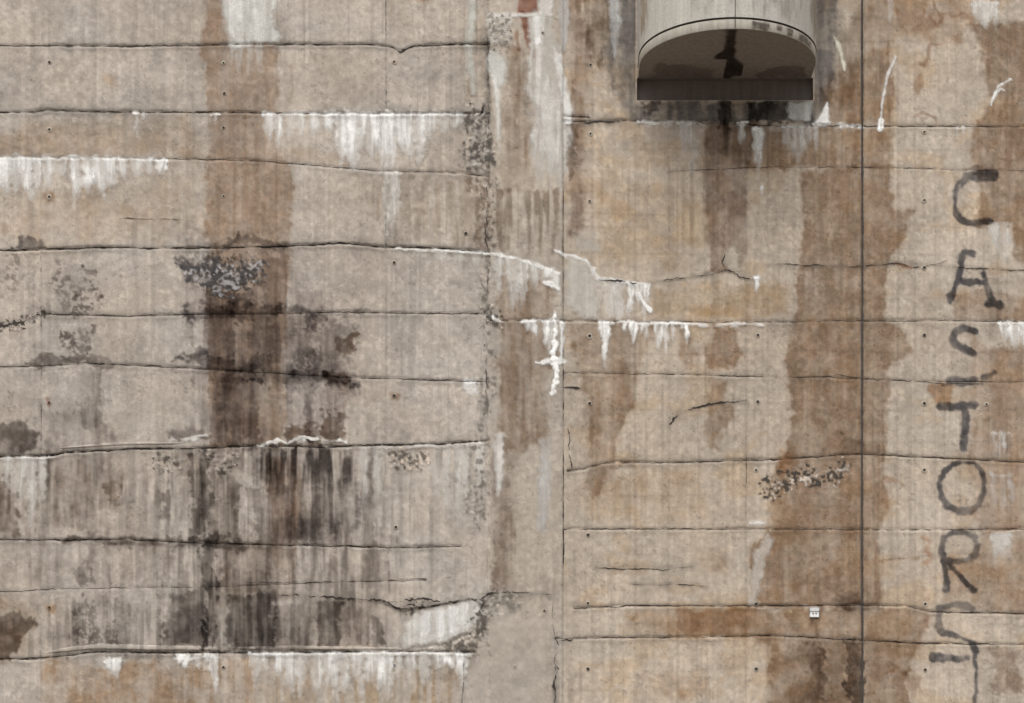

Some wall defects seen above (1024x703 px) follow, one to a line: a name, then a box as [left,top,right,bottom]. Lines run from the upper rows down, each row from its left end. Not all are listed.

water stain [262,111,282,135]
water stain [298,110,437,156]
water stain [0,157,52,190]
water stain [65,155,168,187]
spalling [175,253,269,298]
crack [661,255,1013,281]
water stain [396,247,707,358]
water stain [521,313,566,396]
crack [670,400,745,425]
water stain [260,428,351,478]
spalling [758,457,851,501]
water stain [176,593,297,681]